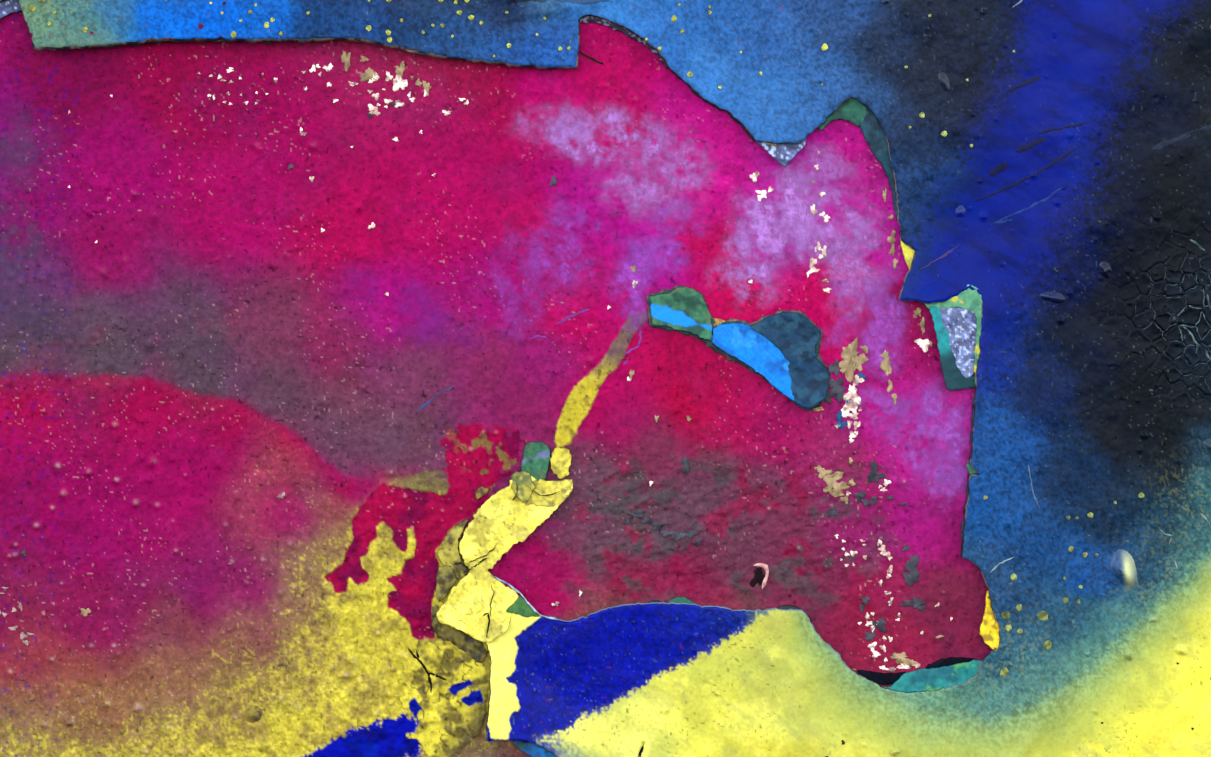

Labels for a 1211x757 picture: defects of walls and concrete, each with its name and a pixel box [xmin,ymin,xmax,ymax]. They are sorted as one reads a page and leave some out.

peeling [301,51,431,119]
peeling [756,139,806,167]
peeling [819,97,898,219]
peeling [914,339,932,353]
peeling [924,285,982,391]
crack [1135,253,1211,393]
peeling [630,266,907,517]
peeling [431,441,573,663]
peeling [858,596,893,658]
peeling [877,539,926,621]
peeling [979,591,1000,651]
peeling [857,657,981,692]